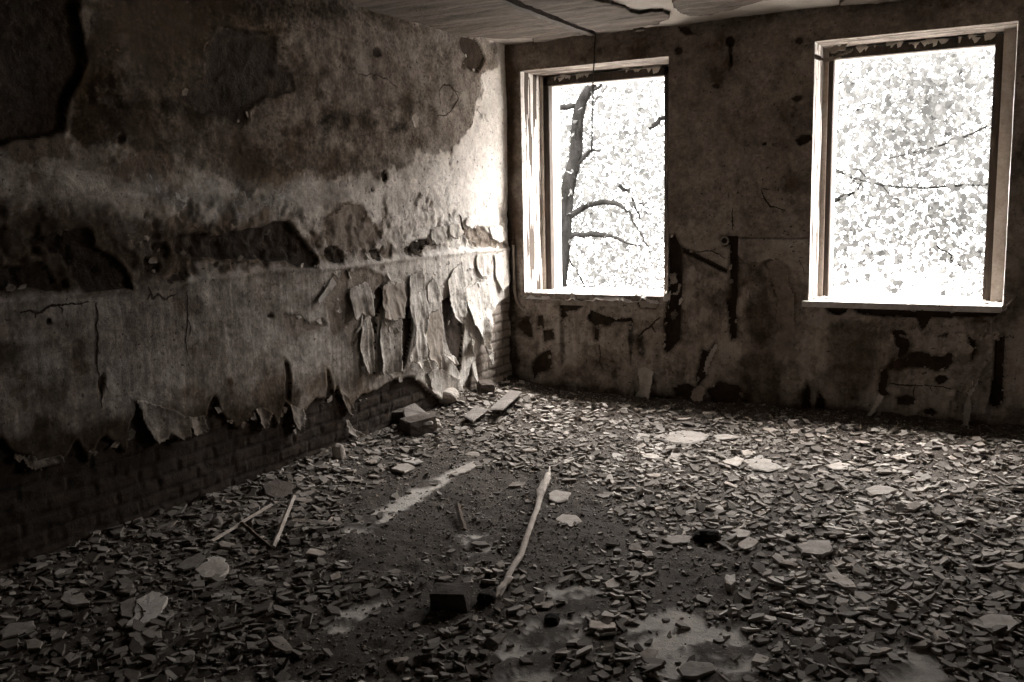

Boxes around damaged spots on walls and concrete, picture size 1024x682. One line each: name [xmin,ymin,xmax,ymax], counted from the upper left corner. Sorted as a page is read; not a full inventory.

damp [70,0,498,196]
flaking render [0,203,745,572]
spalling [826,296,1022,416]